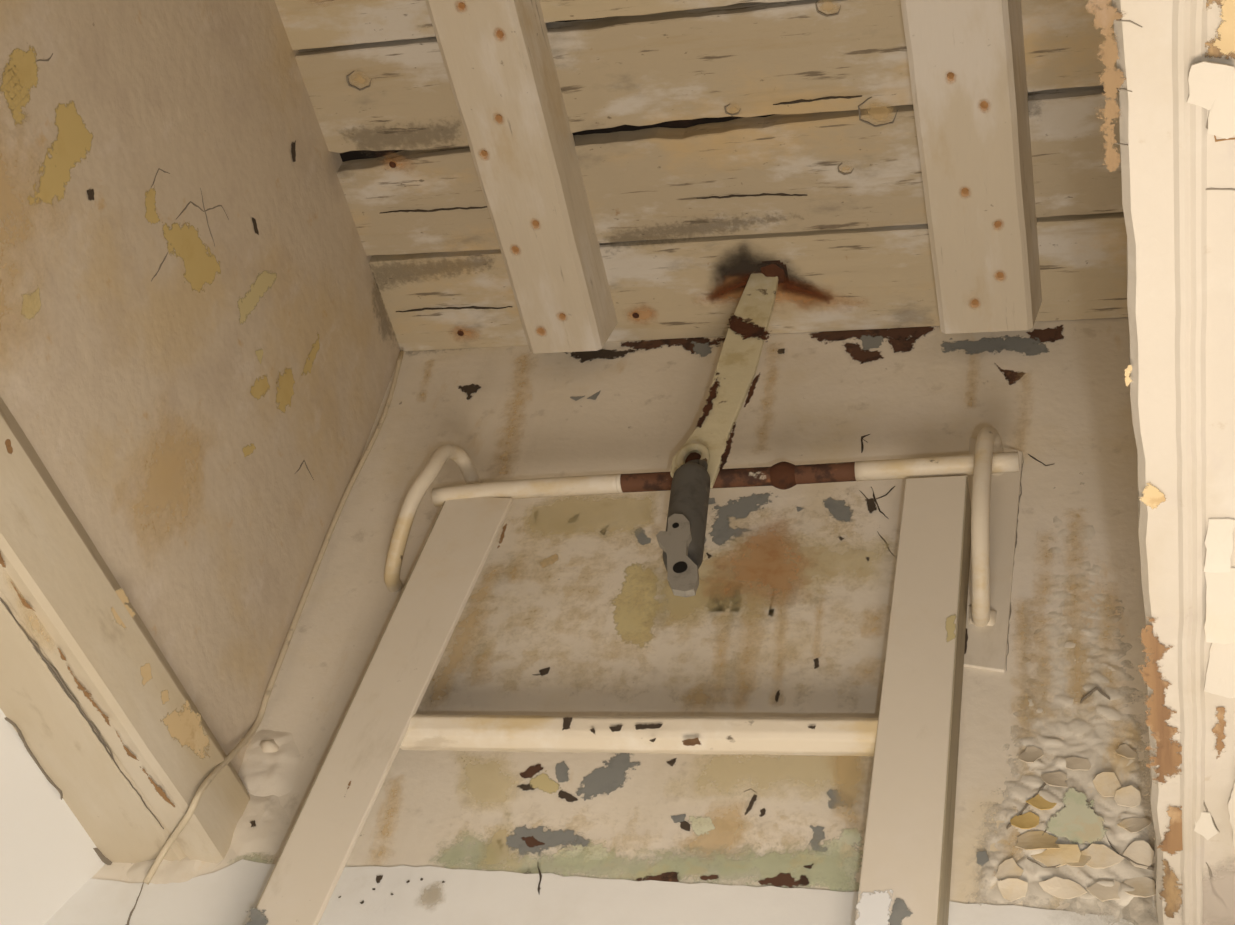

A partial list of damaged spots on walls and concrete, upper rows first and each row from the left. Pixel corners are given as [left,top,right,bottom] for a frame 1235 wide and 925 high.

peeling [1187,0,1235,139]
rust [710,248,830,304]
rust [727,313,770,342]
rust [719,422,736,472]
peeling [704,493,772,558]
peeling [823,497,853,522]
peeling [976,514,1235,921]
peeling [517,753,640,802]
peeling [743,788,766,817]
crack [93,848,112,865]
peeling [506,825,618,890]
crack [126,882,144,925]